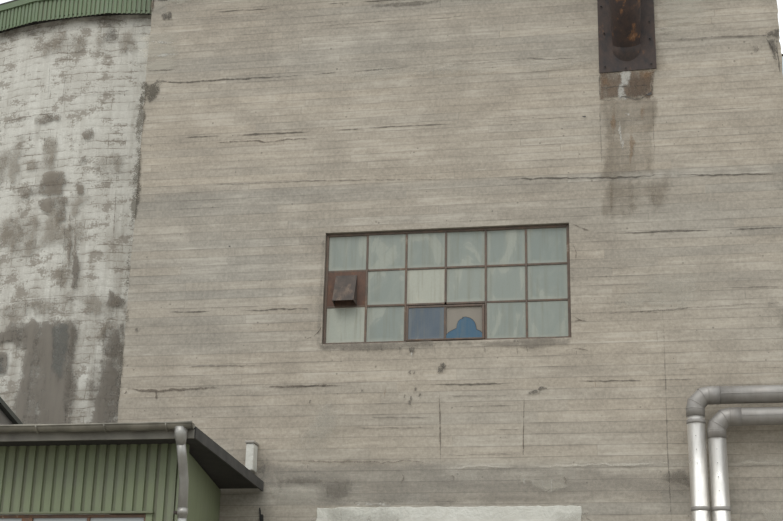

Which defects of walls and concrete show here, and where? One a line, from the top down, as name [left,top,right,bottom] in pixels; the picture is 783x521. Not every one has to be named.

crack [187,132,305,143]
crack [270,382,340,390]
crack [125,387,207,398]